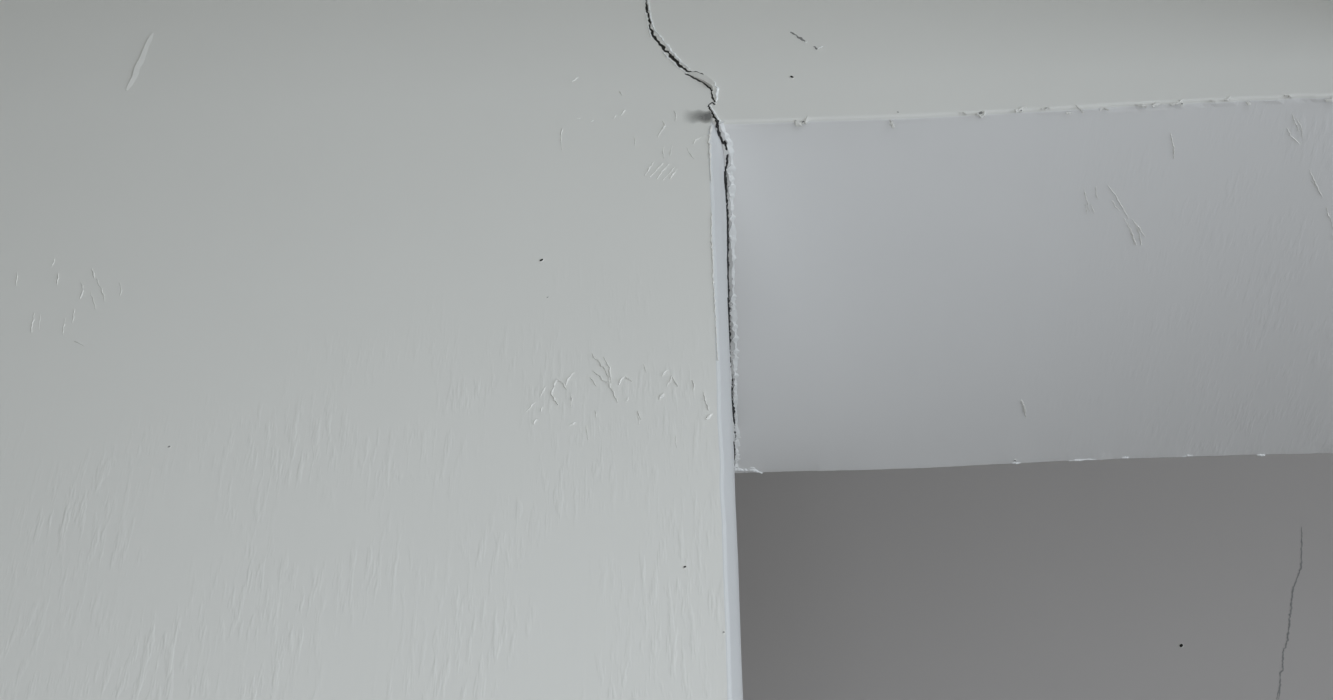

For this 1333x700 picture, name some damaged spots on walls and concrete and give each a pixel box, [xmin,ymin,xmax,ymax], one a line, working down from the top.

crack [645,0,741,468]
crack [1276,527,1303,699]